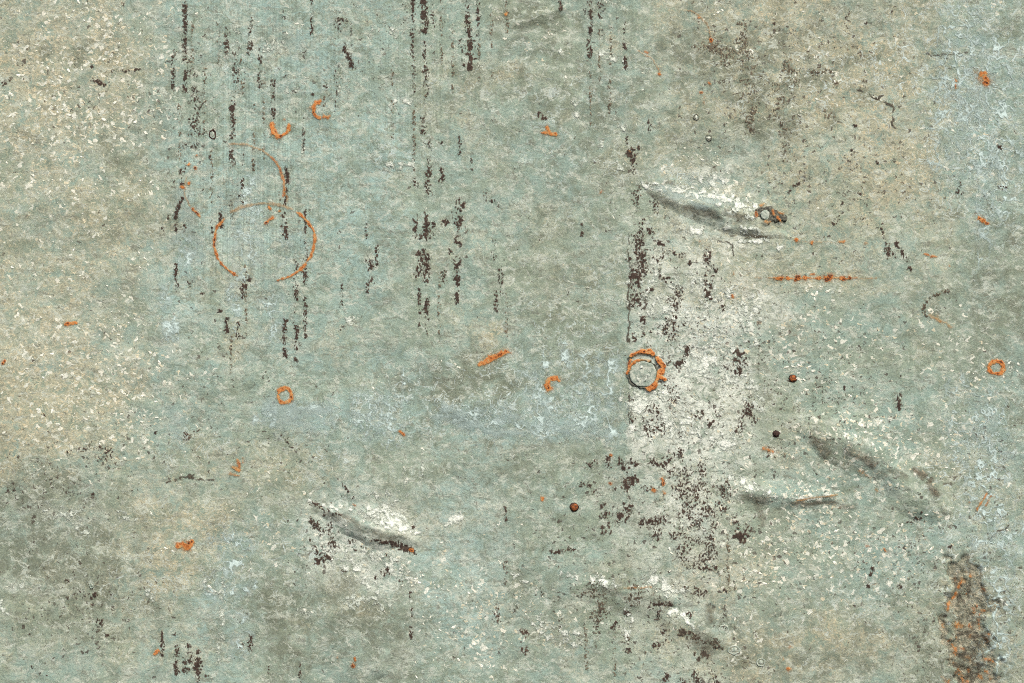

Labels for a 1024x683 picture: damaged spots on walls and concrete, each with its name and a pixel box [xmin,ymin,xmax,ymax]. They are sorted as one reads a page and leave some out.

damp [405,0,510,195]
damp [160,2,276,370]
rust [213,219,236,276]
damp [262,209,309,361]
rust [277,212,317,281]
damp [412,197,468,334]
damp [625,187,725,369]
rust [769,273,852,282]
rust [277,386,293,404]
rust [626,348,667,392]
rust [987,359,1006,375]
damp [577,382,752,592]